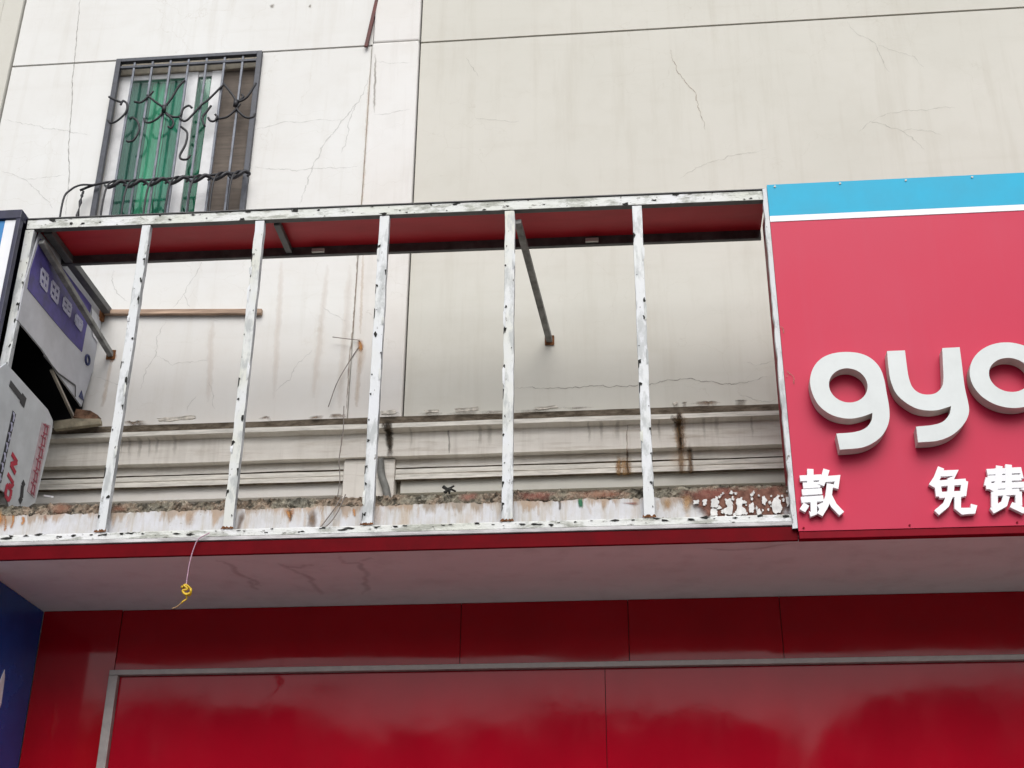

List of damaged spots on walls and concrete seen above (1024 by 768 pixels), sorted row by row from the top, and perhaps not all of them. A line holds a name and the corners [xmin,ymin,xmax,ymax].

peeling [683,486,790,517]